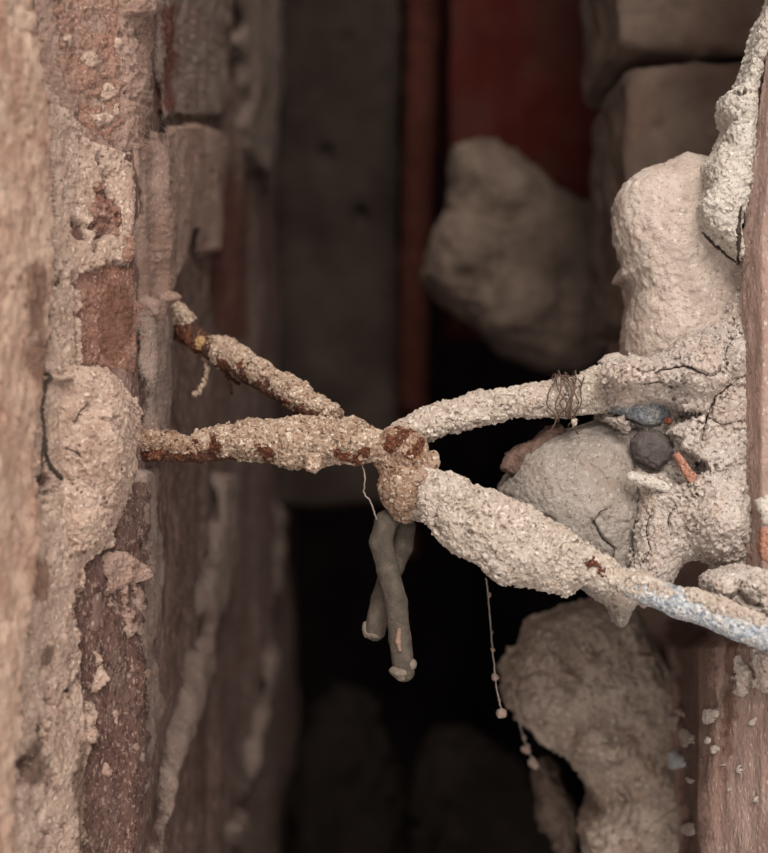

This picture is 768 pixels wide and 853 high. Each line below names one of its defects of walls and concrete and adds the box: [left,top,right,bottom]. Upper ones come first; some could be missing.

crack [701,206,742,265]
corrosion [173,324,201,354]
corrosion [214,358,246,377]
crack [643,332,745,438]
crack [36,371,82,498]
corrosion [143,436,224,461]
corrosion [254,443,277,465]
corrosion [333,447,370,466]
corrosion [382,425,425,461]
corrosion [584,556,607,578]
flaking render [74,481,155,853]